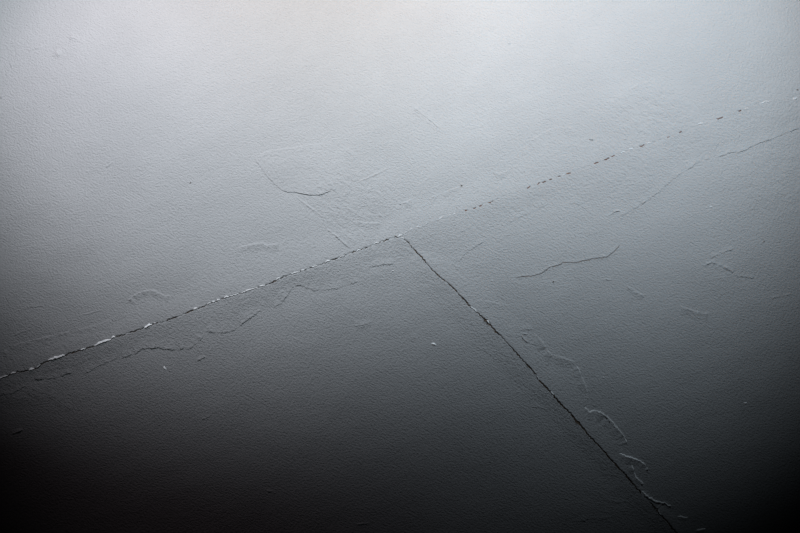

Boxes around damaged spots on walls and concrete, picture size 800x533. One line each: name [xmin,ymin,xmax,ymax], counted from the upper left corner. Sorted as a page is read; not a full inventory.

crack [0,201,677,533]